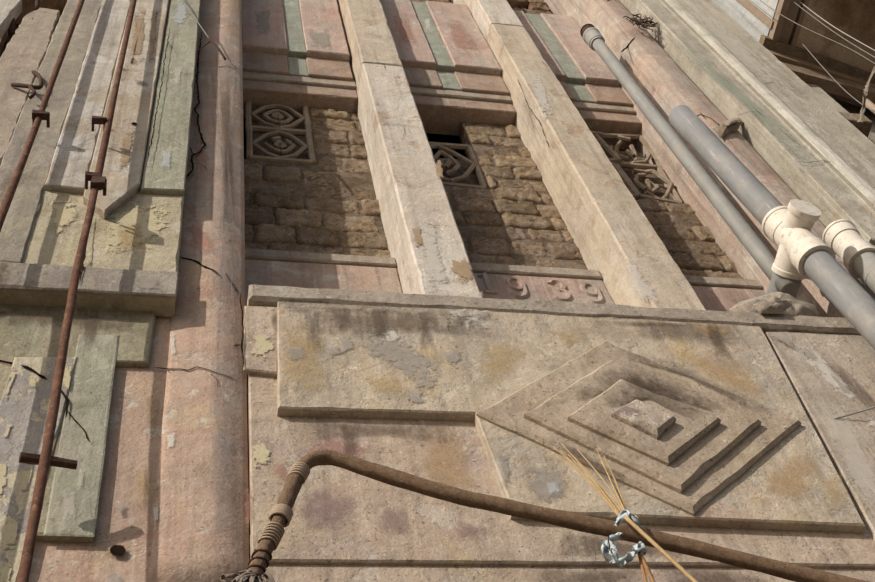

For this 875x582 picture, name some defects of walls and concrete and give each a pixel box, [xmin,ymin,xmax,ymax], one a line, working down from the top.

crack [145,29,172,171]
crack [183,32,207,214]
peeling [51,200,77,233]
peeling [105,201,169,253]
peeling [412,228,422,246]
peeling [451,258,473,283]
crack [153,257,244,386]
crack [0,359,90,442]
peeling [62,364,72,389]
peeling [240,334,274,363]
peeling [326,326,440,403]